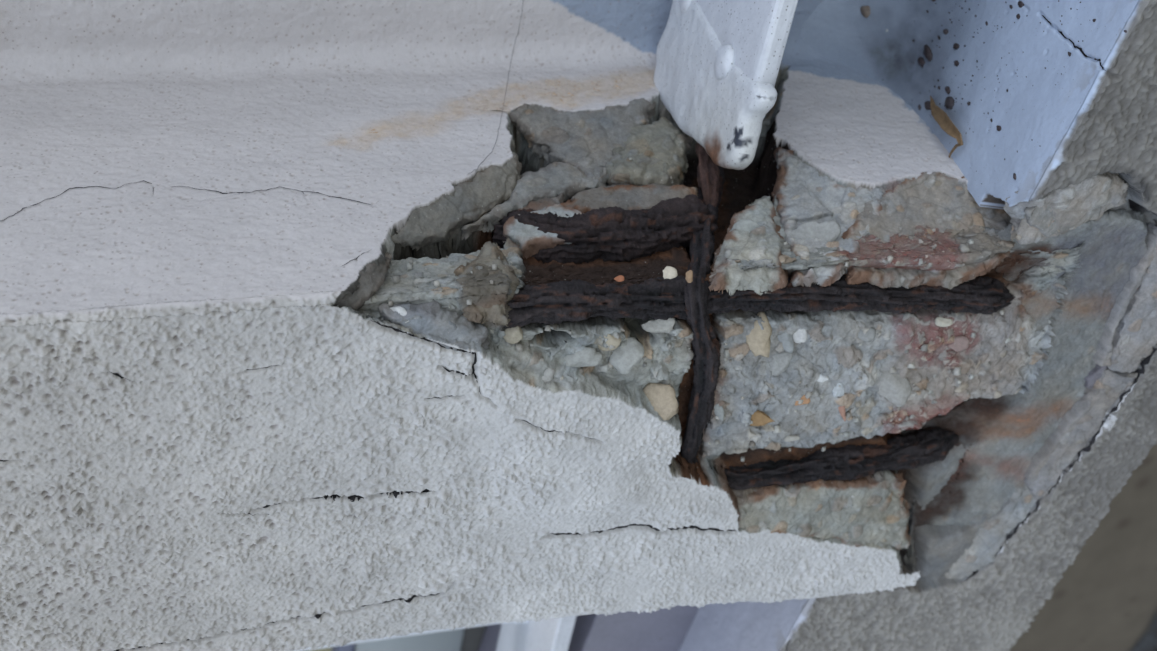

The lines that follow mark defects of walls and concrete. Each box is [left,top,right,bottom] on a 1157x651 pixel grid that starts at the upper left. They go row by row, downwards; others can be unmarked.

crack [1042,15,1106,71]
spalling [331,67,1157,591]
corrosion [895,397,1008,527]
crack [964,348,1157,582]
crack [313,489,430,502]
crack [550,524,736,535]
crack [360,582,453,607]